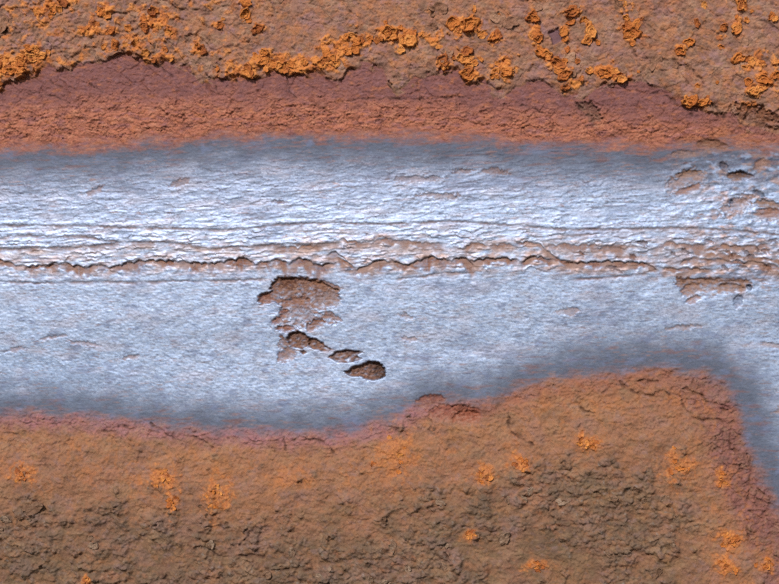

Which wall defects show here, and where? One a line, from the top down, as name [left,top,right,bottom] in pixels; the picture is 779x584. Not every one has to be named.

rust [0,0,779,135]
spalling [665,101,779,199]
spalling [715,190,779,225]
spalling [674,237,779,311]
spalling [257,275,386,381]
rust [0,367,779,584]